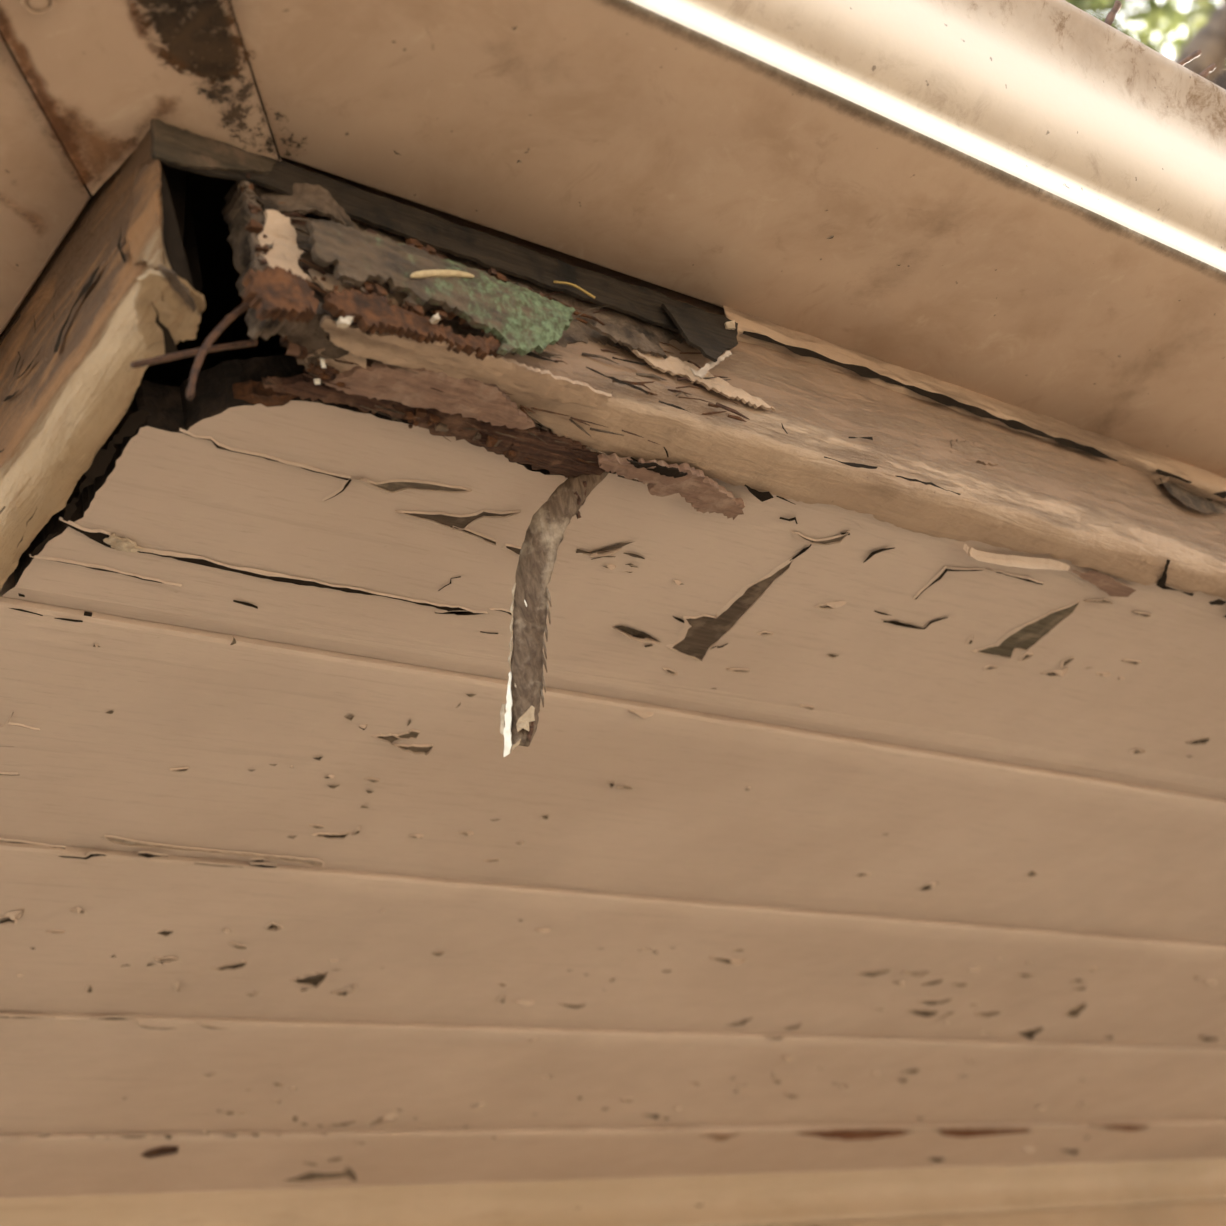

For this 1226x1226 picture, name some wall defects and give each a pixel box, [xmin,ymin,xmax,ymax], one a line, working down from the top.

damp [130,0,308,156]
peeling [126,158,201,350]
peeling [256,183,409,306]
peeling [305,315,612,409]
crack [526,352,692,413]
peeling [632,350,775,412]
crack [743,331,1117,461]
crack [824,437,960,495]
crack [744,484,813,561]
crack [841,532,895,563]
peeling [611,558,793,661]
peeling [963,544,1136,670]